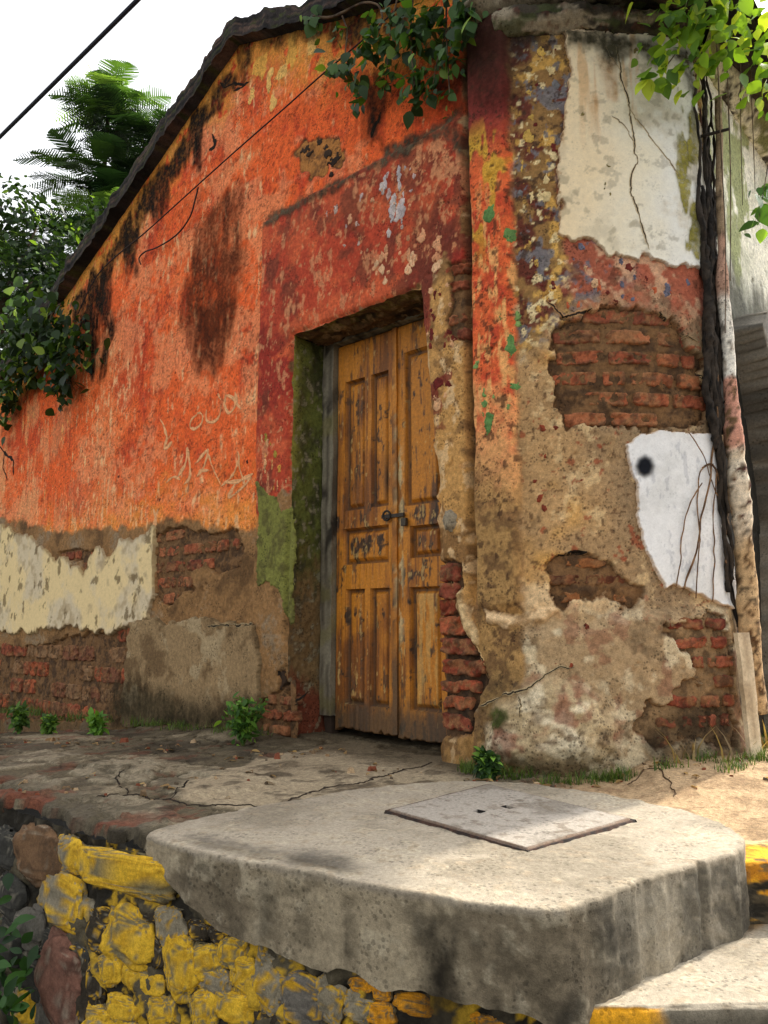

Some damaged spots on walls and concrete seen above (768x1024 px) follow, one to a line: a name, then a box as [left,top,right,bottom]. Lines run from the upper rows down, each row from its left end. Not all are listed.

leakage [73,7,413,380]
spalling [296,138,345,179]
spalling [343,165,473,360]
peeling [483,204,495,223]
crack [607,49,678,250]
peeling [481,388,495,436]
peeling [517,29,736,748]
peeling [0,433,297,725]
spalling [439,560,489,737]
crack [476,646,574,717]
crack [96,769,256,807]
crack [288,762,432,801]